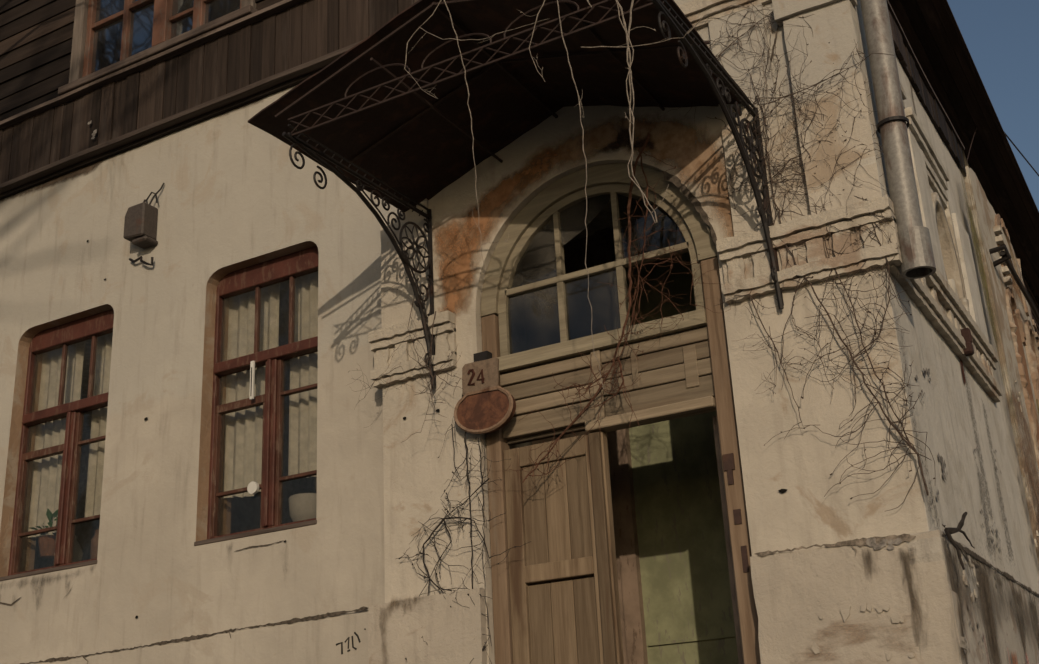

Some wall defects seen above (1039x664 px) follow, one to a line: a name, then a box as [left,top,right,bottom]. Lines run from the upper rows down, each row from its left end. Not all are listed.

peeling [436,117,734,313]
spalling [1012,380,1039,548]
crack [20,606,368,664]
peeling [959,556,988,662]
damp [945,545,1039,664]